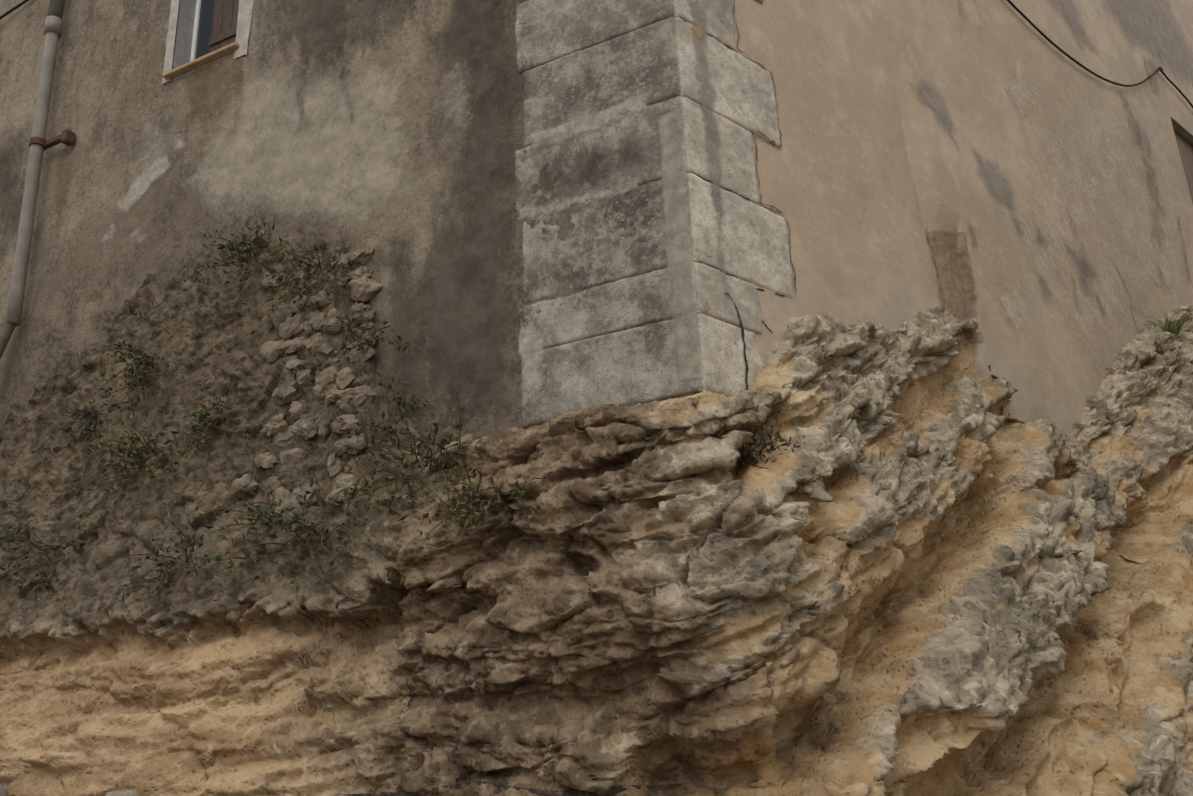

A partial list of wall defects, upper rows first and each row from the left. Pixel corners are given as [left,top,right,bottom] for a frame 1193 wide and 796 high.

damp [270,0,427,77]
damp [0,137,24,255]
damp [392,0,525,418]
flaking render [232,245,393,515]